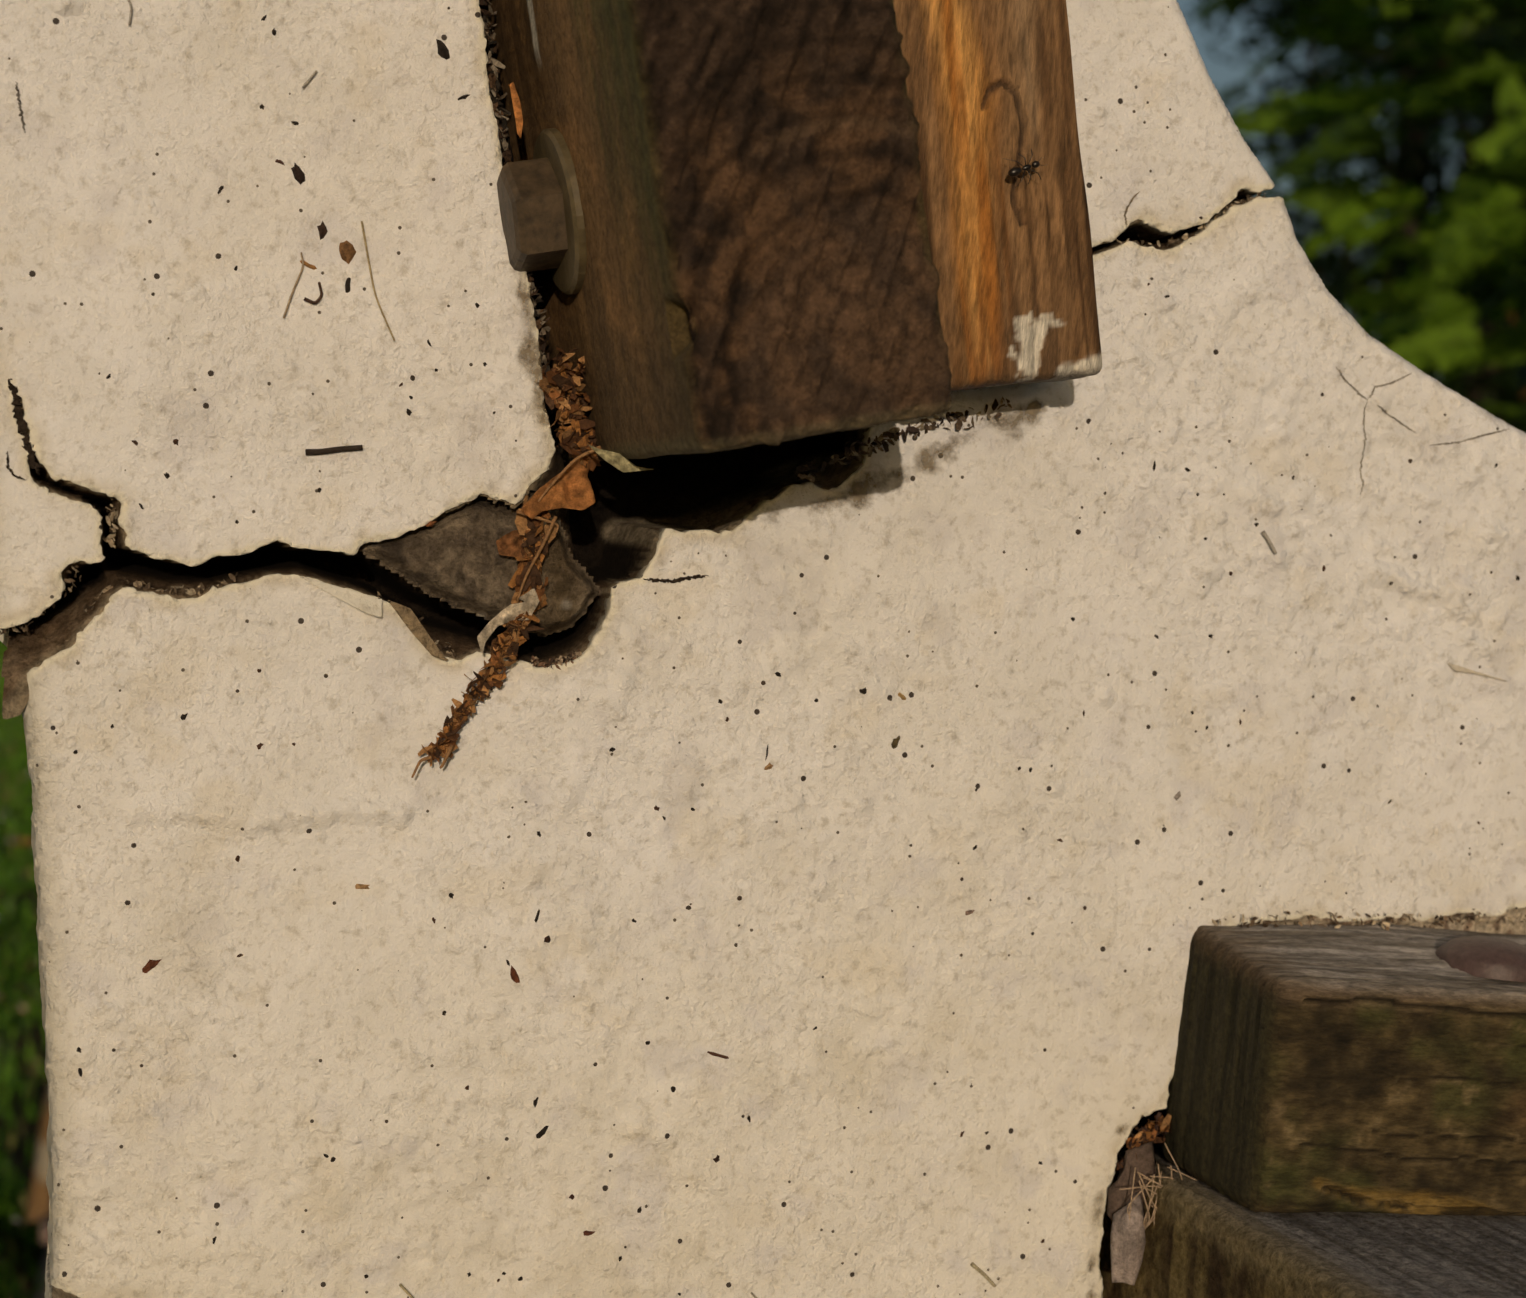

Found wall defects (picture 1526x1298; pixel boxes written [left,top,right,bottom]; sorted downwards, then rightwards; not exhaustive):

crack [479,3,502,119]
crack [1092,189,1266,255]
crack [0,379,708,719]
spalling [1242,907,1526,935]